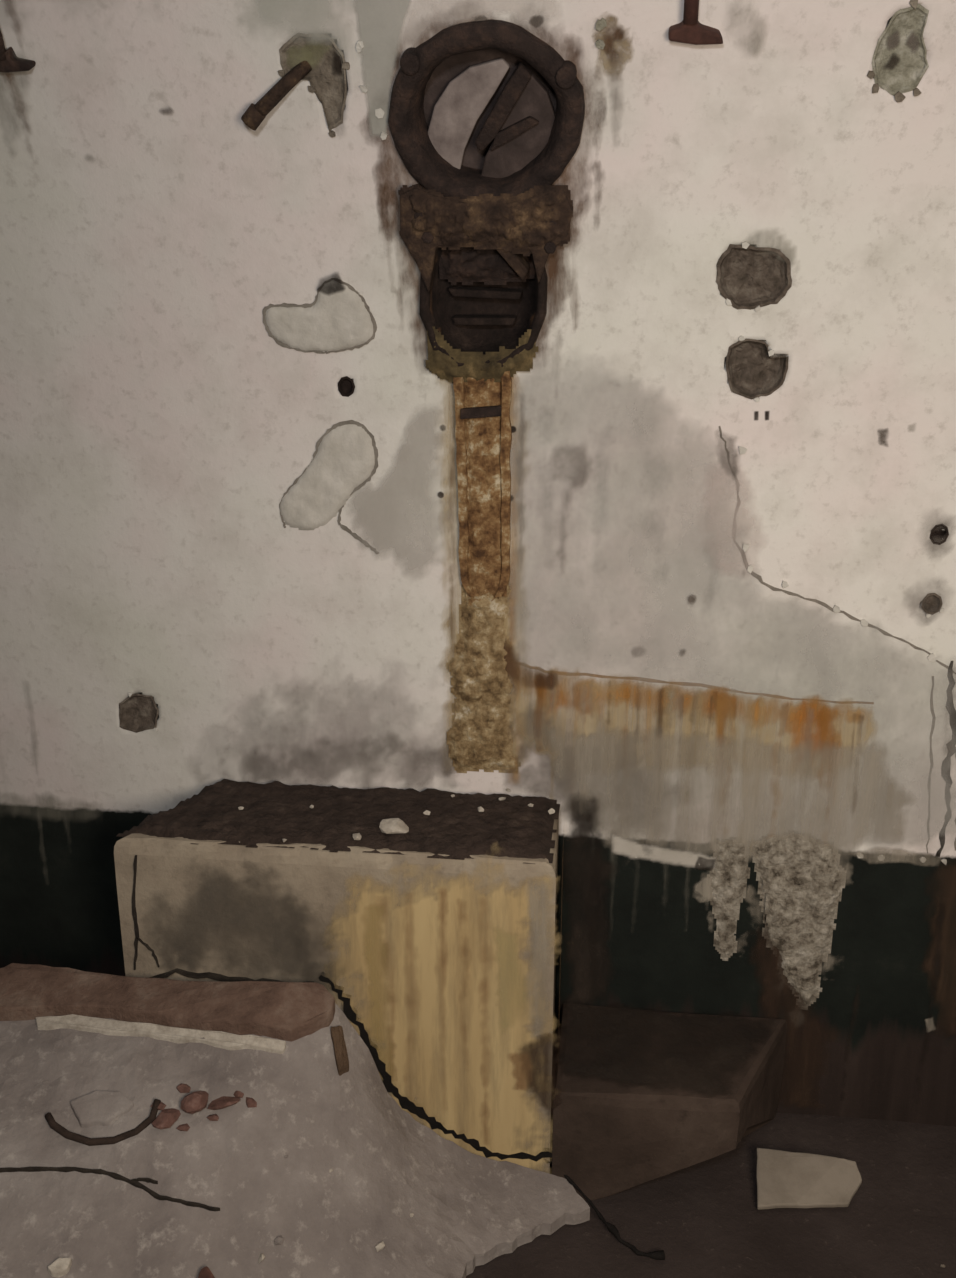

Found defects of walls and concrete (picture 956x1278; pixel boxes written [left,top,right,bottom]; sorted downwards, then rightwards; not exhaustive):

rust [394,4,481,71]
spalling [867,0,929,102]
rust [367,109,421,301]
rust [536,226,572,351]
spalling [716,241,792,312]
spalling [726,335,789,402]
rust [444,377,874,780]
spalling [119,692,159,733]
crack [926,661,956,857]
leakage [552,733,768,1095]
leakage [696,744,906,1010]
crack [132,855,665,1260]